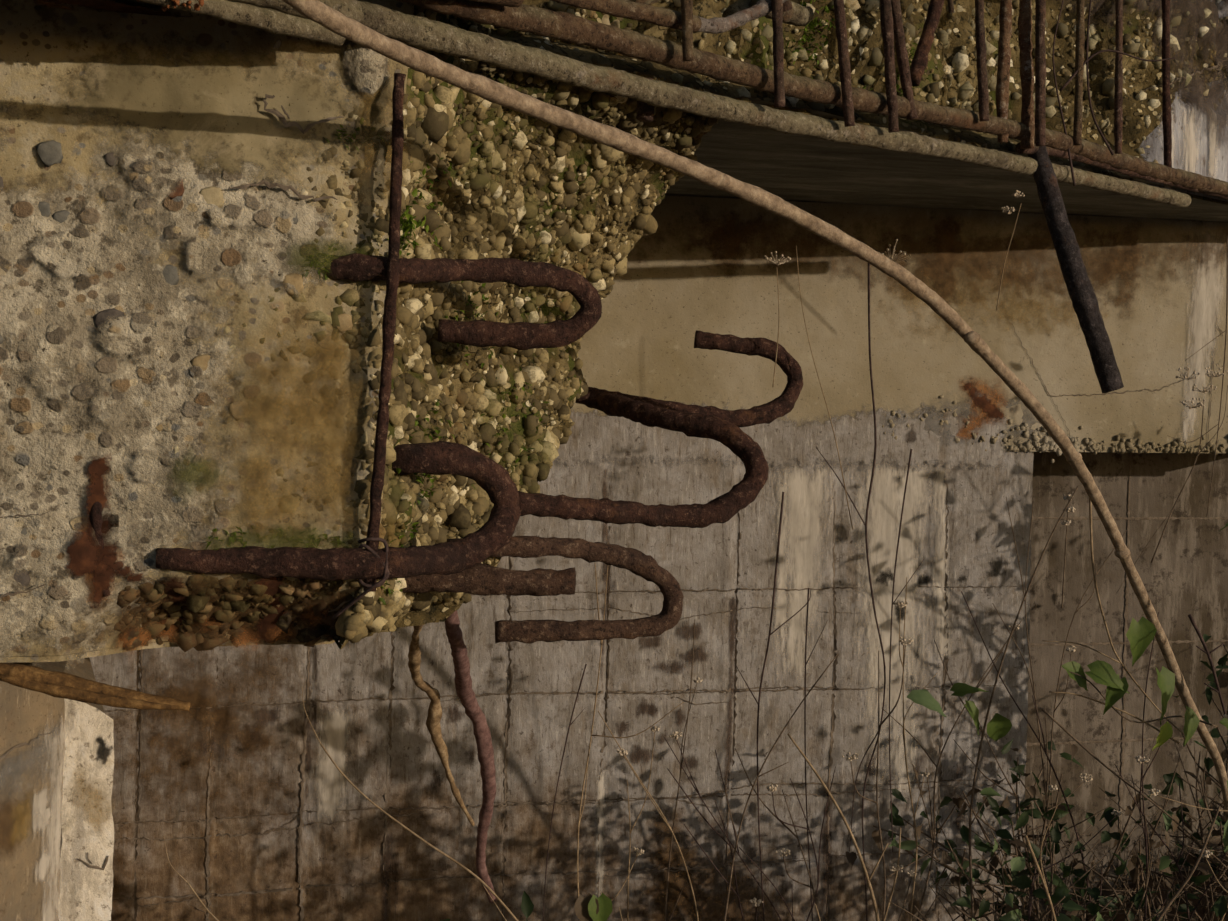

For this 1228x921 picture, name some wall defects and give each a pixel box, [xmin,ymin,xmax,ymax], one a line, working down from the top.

spalling [431,51,718,161]
spalling [802,0,903,96]
spalling [902,0,1228,163]
spalling [0,71,803,674]
rust [957,377,1006,438]
crack [0,510,49,518]
rust [66,453,144,608]
crack [0,584,46,598]
rust [120,574,346,647]
damp [305,704,349,819]
damp [112,854,125,921]
damp [646,819,784,921]